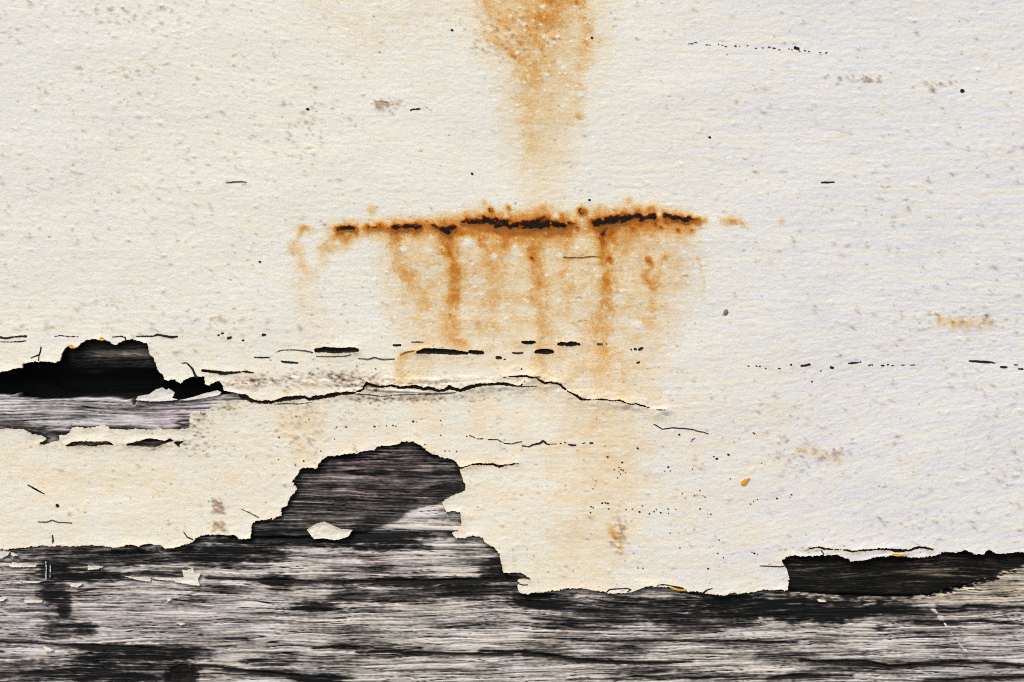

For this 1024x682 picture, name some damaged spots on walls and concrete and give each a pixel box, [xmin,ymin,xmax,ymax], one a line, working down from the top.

rust [335,207,700,245]
crack [0,335,78,361]
peeling [0,337,245,448]
crack [112,333,178,341]
crack [182,332,709,434]
peeling [0,441,1024,682]